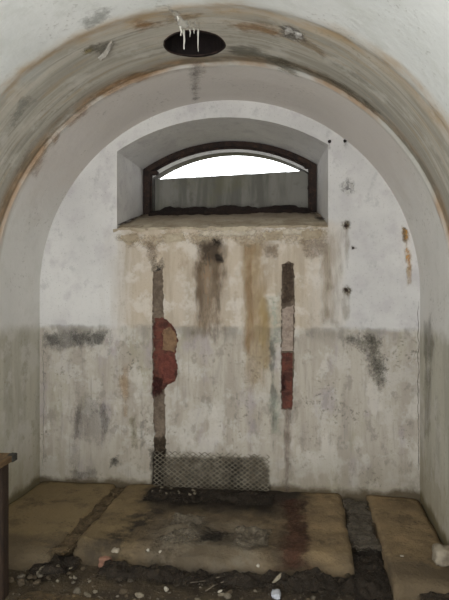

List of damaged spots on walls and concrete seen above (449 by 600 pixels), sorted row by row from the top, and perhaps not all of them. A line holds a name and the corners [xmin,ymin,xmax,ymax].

water stain [197,239,225,330]
flaking render [151,317,179,397]
flaking render [282,352,293,409]